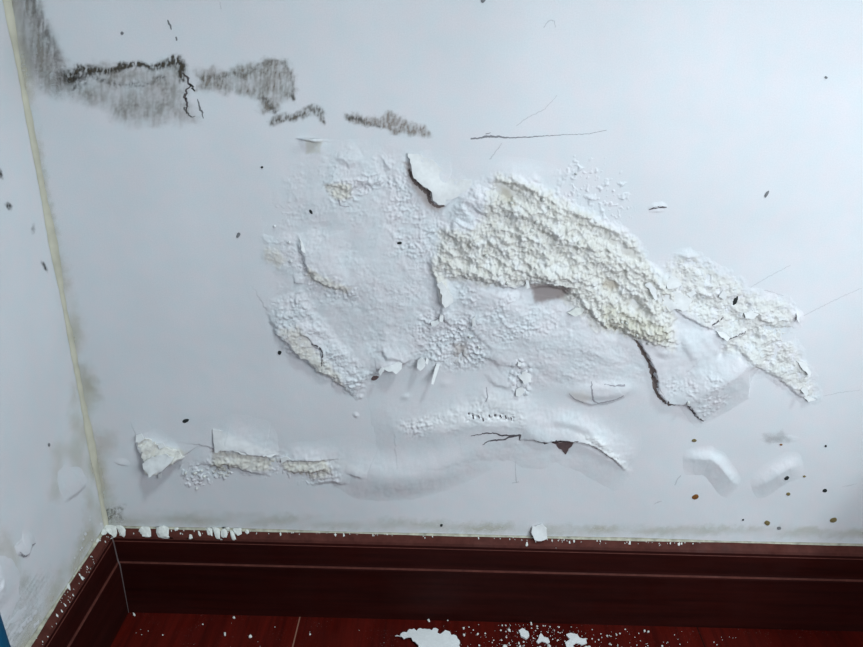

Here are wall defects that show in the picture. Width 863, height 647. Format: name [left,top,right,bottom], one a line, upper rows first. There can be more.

water stain [20,0,185,89]
water stain [239,61,325,124]
peeling [264,138,335,170]
water stain [349,113,425,135]
flaking render [396,140,823,405]
peeling [131,415,343,492]
crack [472,432,521,445]
peeling [0,528,36,621]